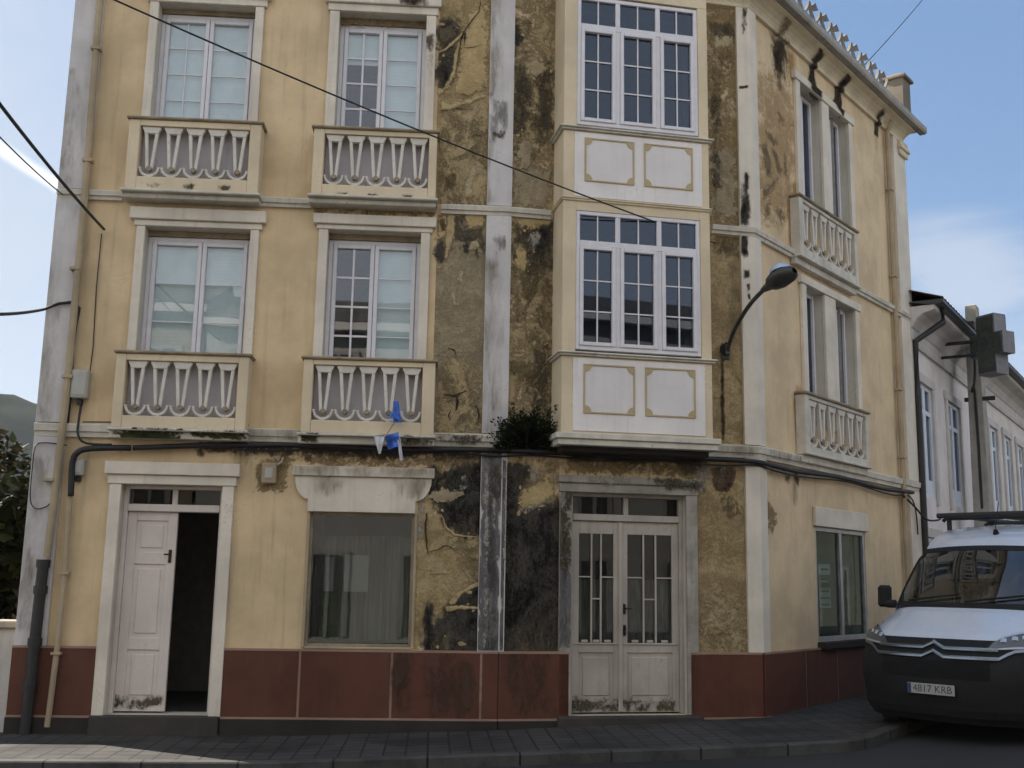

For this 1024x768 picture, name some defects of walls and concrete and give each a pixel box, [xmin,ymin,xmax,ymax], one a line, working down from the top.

crack [438,0,483,75]
water stain [772,17,794,91]
water stain [314,0,556,425]
water stain [706,5,743,444]
water stain [190,430,559,691]
flaking render [414,498,479,650]
crack [424,513,475,575]
peeling [514,457,572,648]
spalling [712,466,736,492]